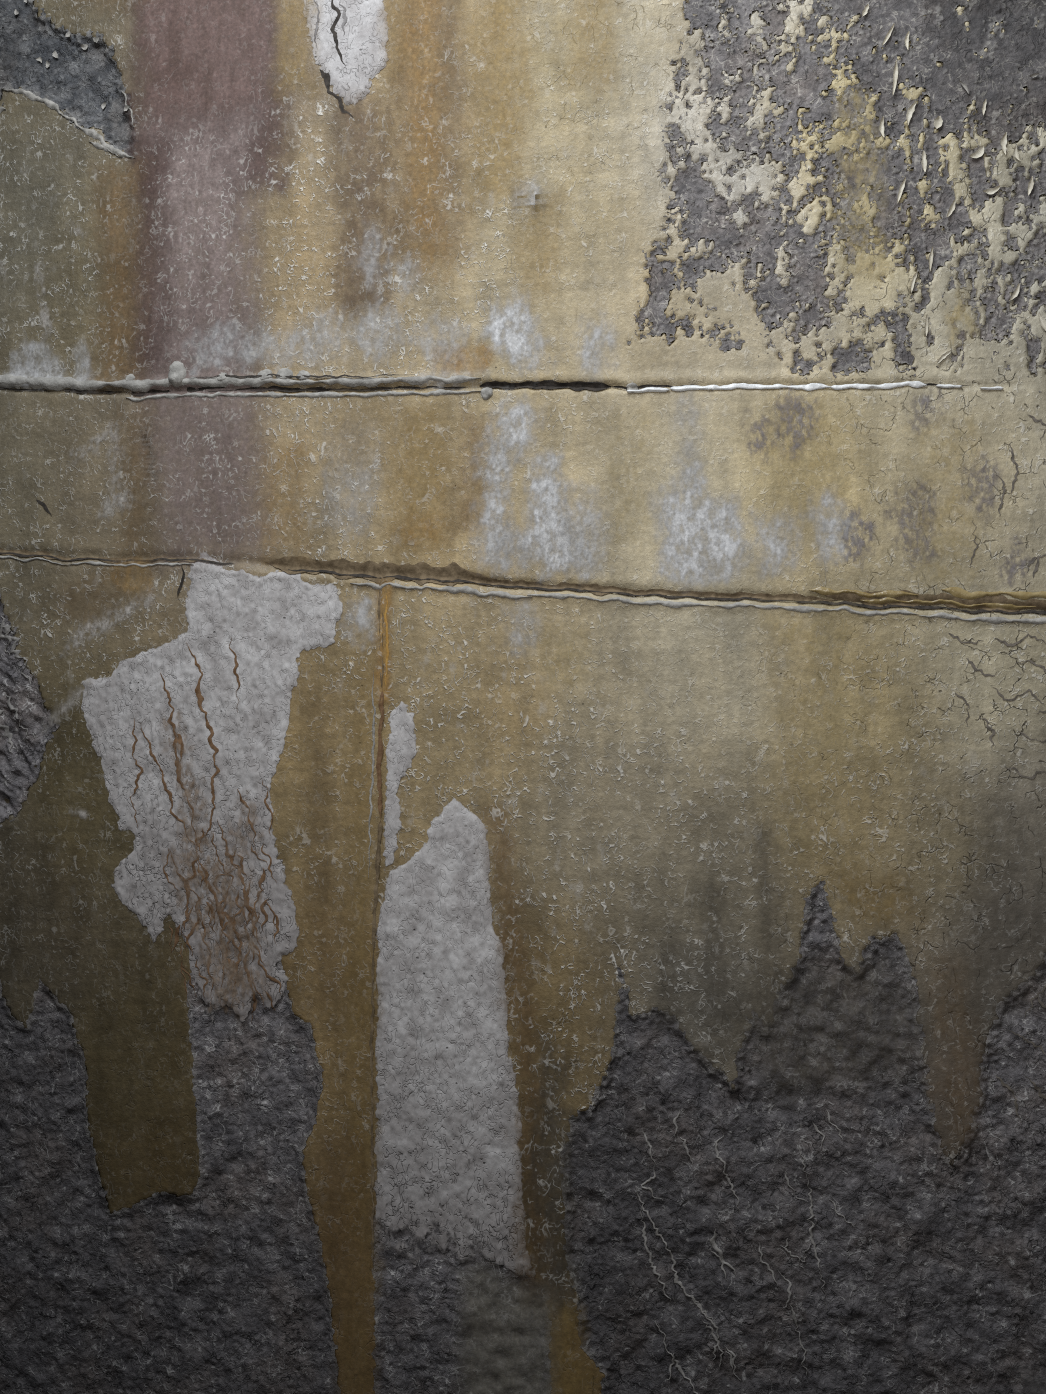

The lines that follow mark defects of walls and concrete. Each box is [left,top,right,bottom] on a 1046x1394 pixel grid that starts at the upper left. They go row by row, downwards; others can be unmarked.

water stain [11,310,89,385]
flaking render [303,0,389,117]
crack [0,361,1003,402]
water stain [485,301,543,369]
water stain [481,403,599,579]
water stain [652,462,744,583]
peeling [627,0,1046,393]
spalling [0,552,343,1394]
rust [130,642,281,1021]
flaking render [370,701,552,1394]
crack [0,415,1046,1261]
spalling [560,880,1046,1394]